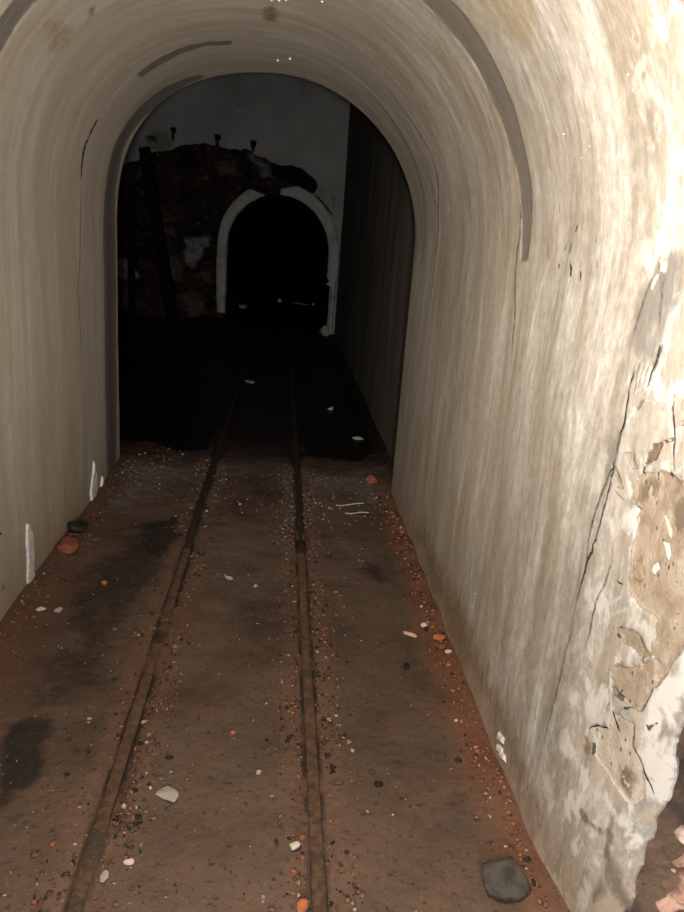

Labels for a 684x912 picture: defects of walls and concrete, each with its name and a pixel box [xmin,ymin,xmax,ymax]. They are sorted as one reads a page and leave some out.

crack [544,252,683,744]
spalling [584,437,684,806]
spalling [655,825,684,912]